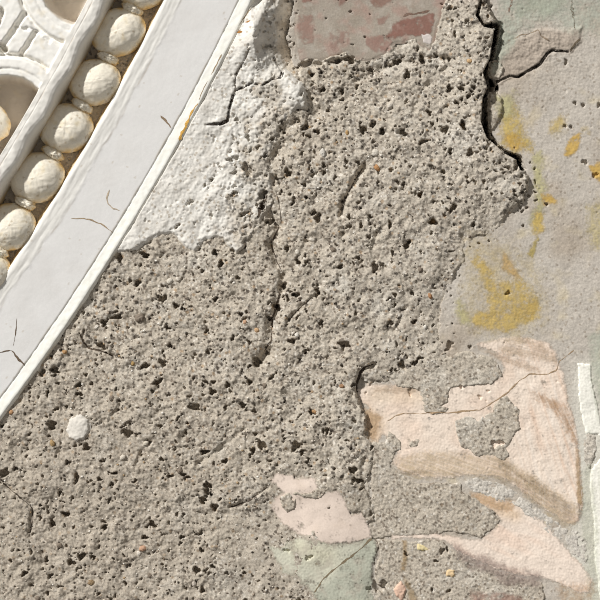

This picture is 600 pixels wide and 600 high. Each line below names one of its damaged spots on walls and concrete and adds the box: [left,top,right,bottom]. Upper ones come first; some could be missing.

flaking render [117,0,309,254]
crack [207,50,284,125]
spalling [487,91,503,133]
spalling [487,60,504,79]
crack [476,0,581,170]
crack [388,350,574,421]
peeling [357,336,583,524]
peeling [271,473,374,547]
spalling [368,441,592,593]
crack [314,537,379,592]
spalling [270,537,545,600]